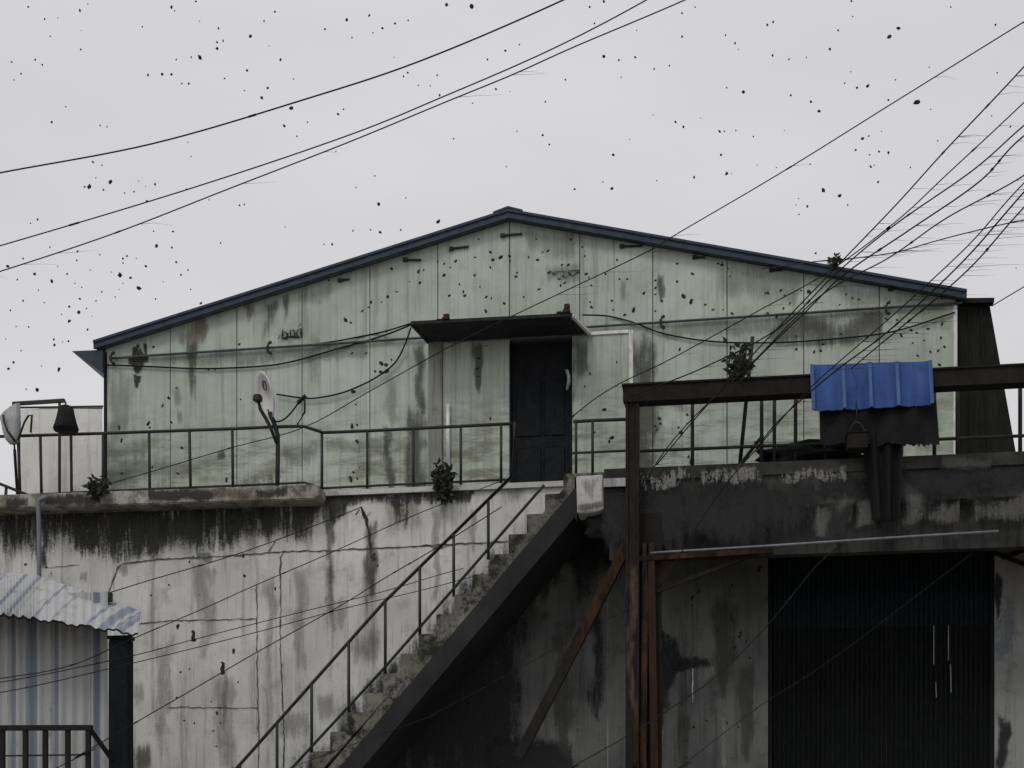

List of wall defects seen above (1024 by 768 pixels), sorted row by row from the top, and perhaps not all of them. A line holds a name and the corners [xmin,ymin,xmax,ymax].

water stain [472,344,487,390]
water stain [0,343,437,594]
peeling [642,467,687,490]
peeling [702,467,758,484]
peeling [783,466,846,483]
water stain [453,491,474,504]
water stain [587,613,608,717]